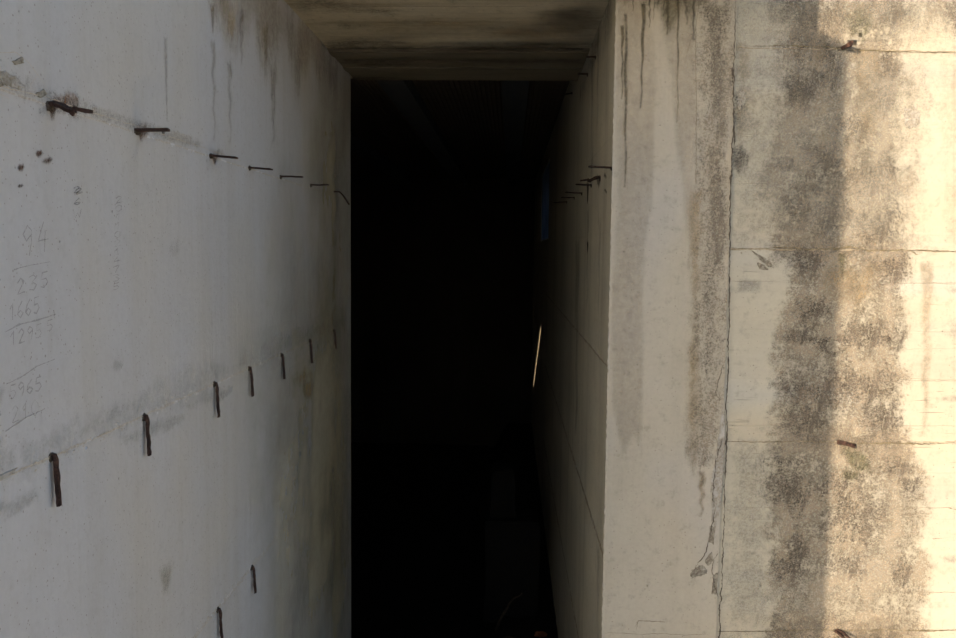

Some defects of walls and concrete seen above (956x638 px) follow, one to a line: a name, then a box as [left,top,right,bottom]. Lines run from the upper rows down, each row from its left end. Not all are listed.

leakage [641,0,650,83]
leakage [691,0,748,465]
crack [626,0,956,638]
leakage [763,0,956,638]